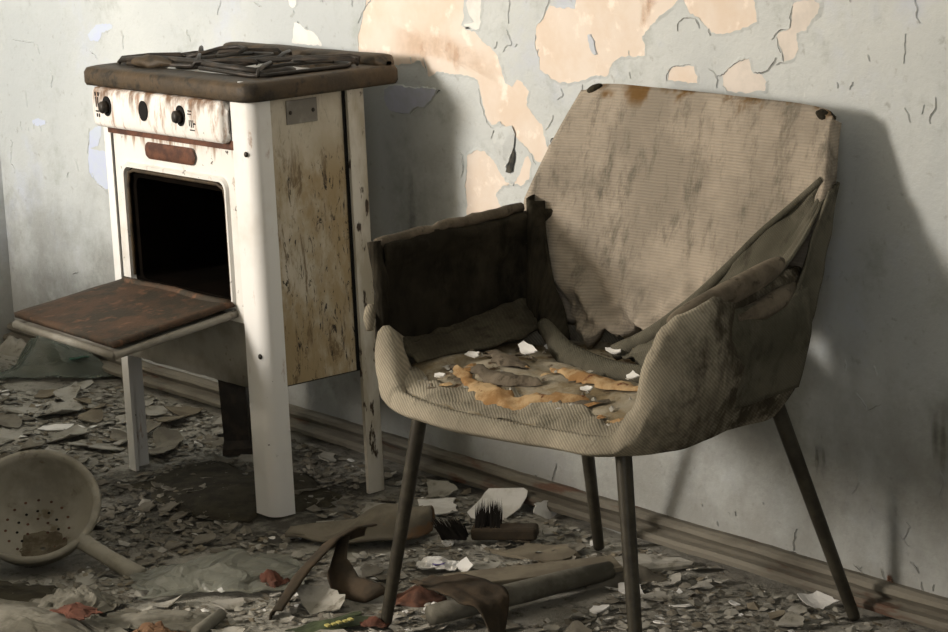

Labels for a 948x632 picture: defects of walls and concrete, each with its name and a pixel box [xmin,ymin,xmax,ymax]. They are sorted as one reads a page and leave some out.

peeling [291,21,323,48]
peeling [357,0,552,215]
peeling [533,0,759,87]
crack [666,6,793,88]
peeling [721,55,769,96]
peeling [775,0,824,64]
crack [903,0,921,64]
crack [904,97,937,124]
peeling [88,126,108,190]